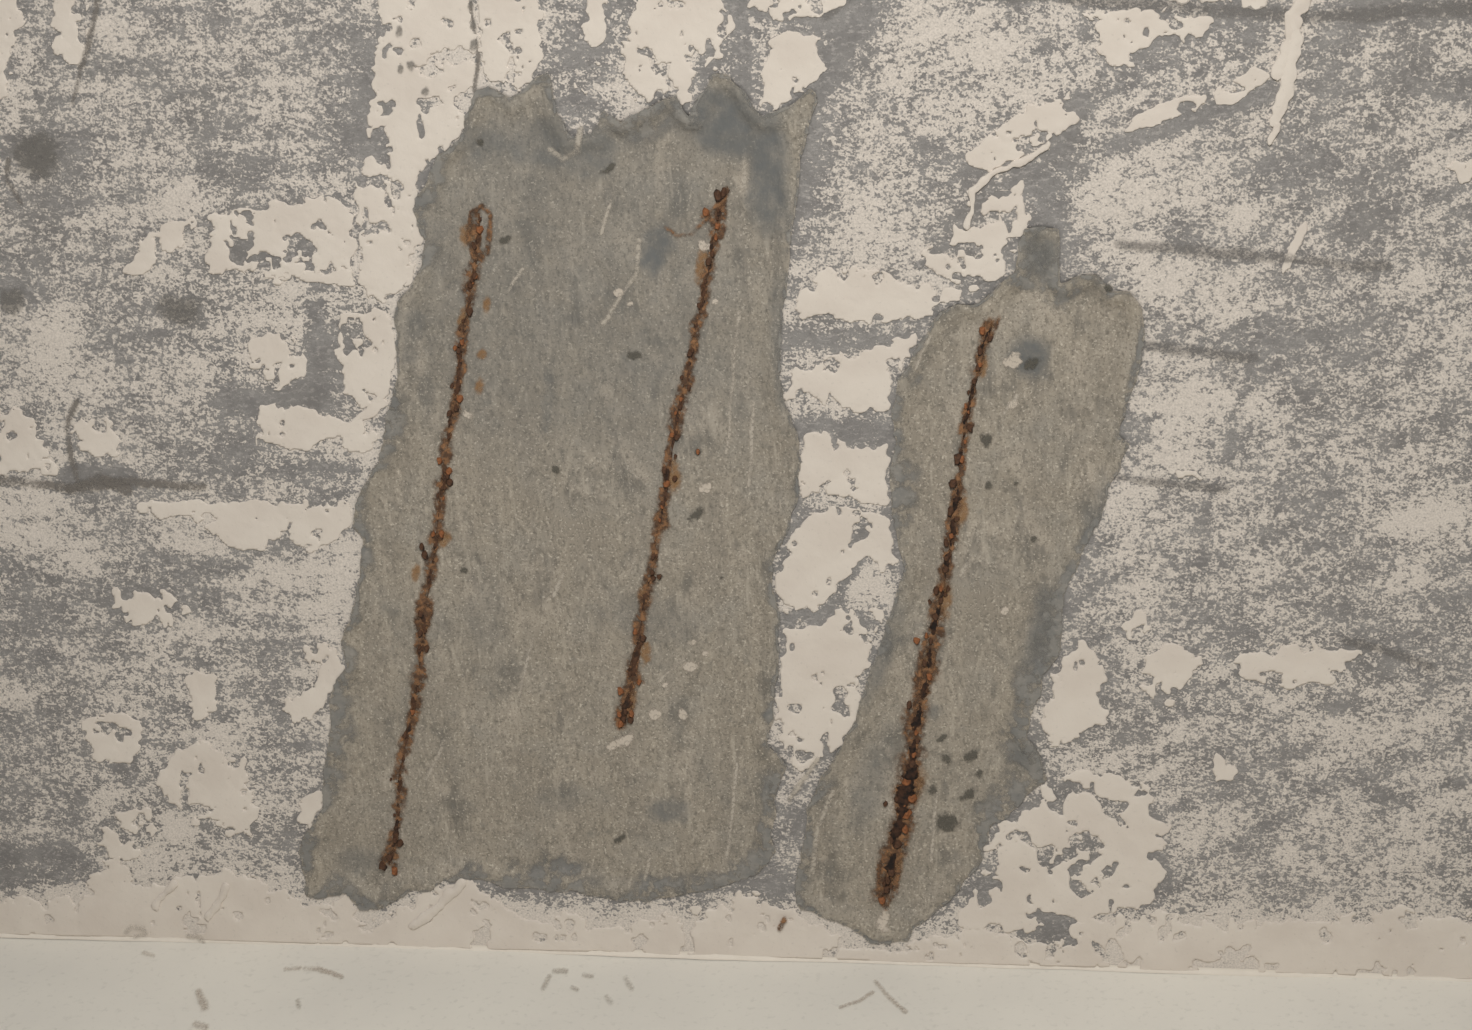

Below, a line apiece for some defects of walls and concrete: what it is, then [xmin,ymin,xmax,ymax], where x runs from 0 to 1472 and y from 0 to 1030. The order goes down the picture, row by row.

crack [0,399,206,495]
rust [379,203,493,876]
spalling [0,0,918,959]
rust [614,186,729,729]
rust [872,318,1000,910]
spalling [774,180,1472,979]